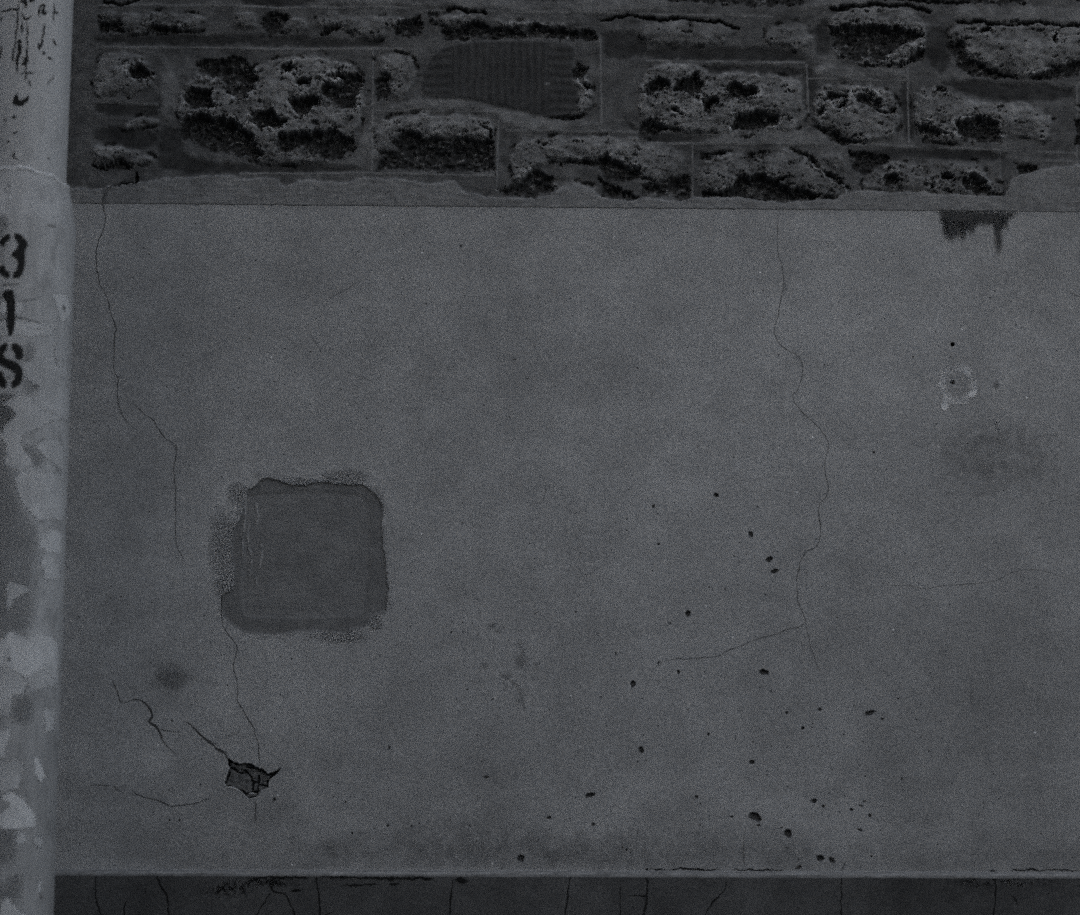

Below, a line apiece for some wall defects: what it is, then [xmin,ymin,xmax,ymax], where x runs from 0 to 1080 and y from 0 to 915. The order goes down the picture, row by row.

crack [95,177,185,561]
crack [657,214,829,669]
crack [221,590,260,761]
crack [112,681,228,759]
crack [101,785,210,807]
flaking render [221,753,281,802]
peeling [0,898,25,915]
crack [257,876,333,915]
crack [620,868,649,915]